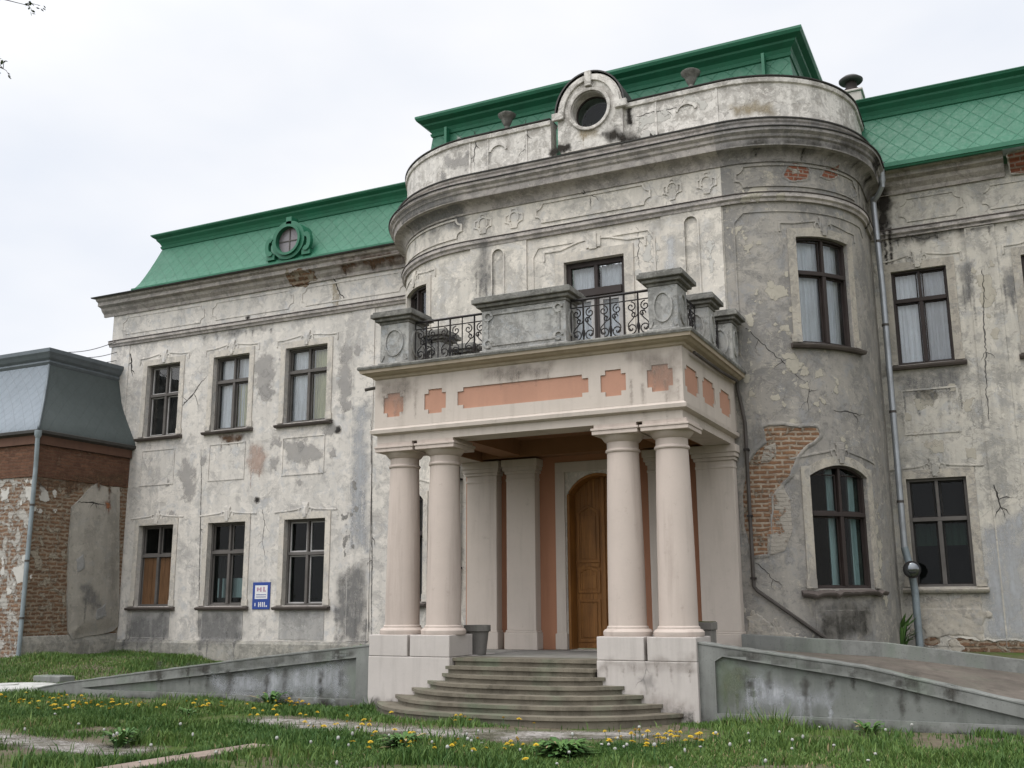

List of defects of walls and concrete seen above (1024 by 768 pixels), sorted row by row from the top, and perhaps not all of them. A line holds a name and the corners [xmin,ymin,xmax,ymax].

flaking render [740,160,841,210]
flaking render [1006,148,1024,175]
spalling [285,268,318,288]
crack [981,270,994,419]
crack [746,328,863,423]
flaking render [738,379,839,559]
peeling [1,479,57,513]
crack [993,485,1014,515]
peeling [0,554,31,595]
spalling [910,594,1024,653]